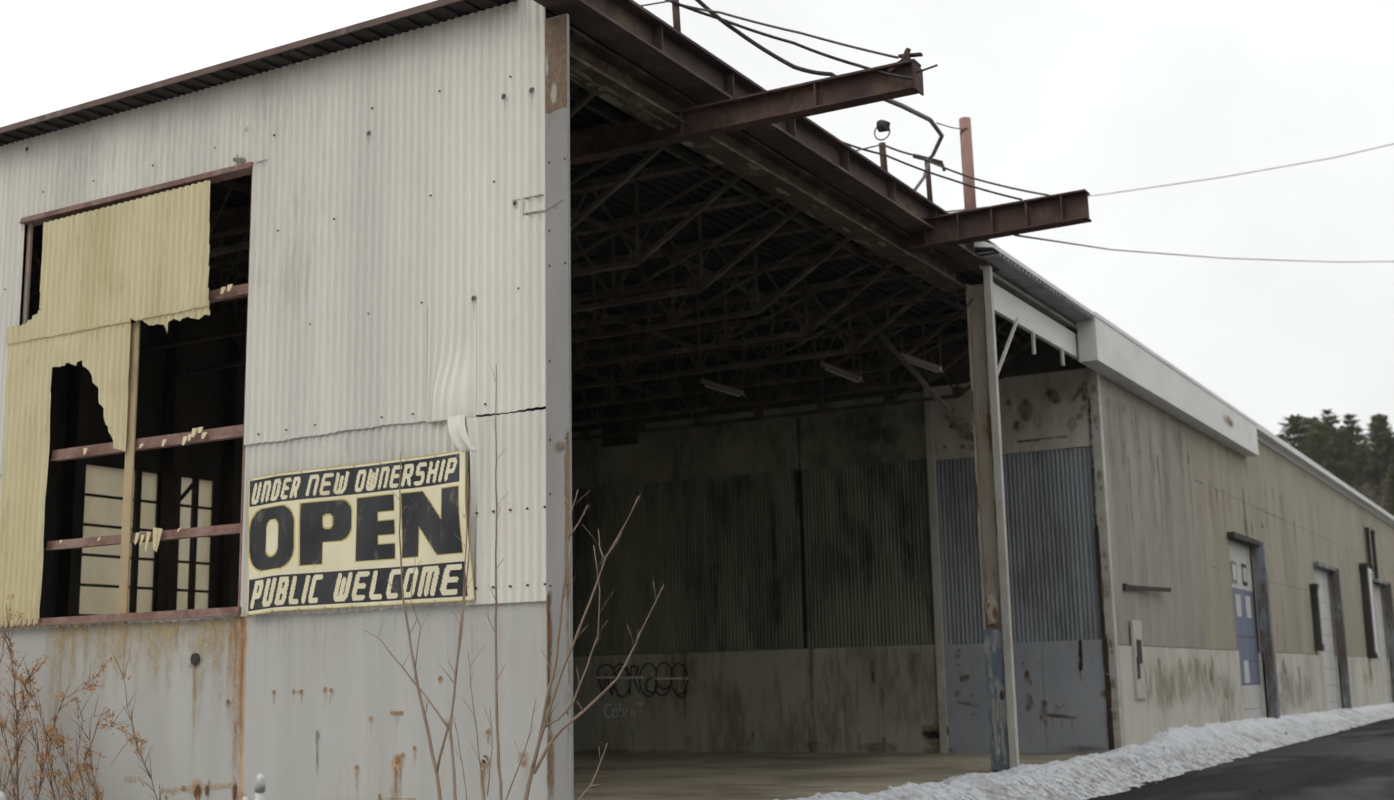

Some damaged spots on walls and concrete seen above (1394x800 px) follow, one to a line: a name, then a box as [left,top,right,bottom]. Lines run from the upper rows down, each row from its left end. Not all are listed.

rust [54,615,244,742]
rust [162,781,244,800]
rust [392,747,416,800]
rust [481,729,491,796]